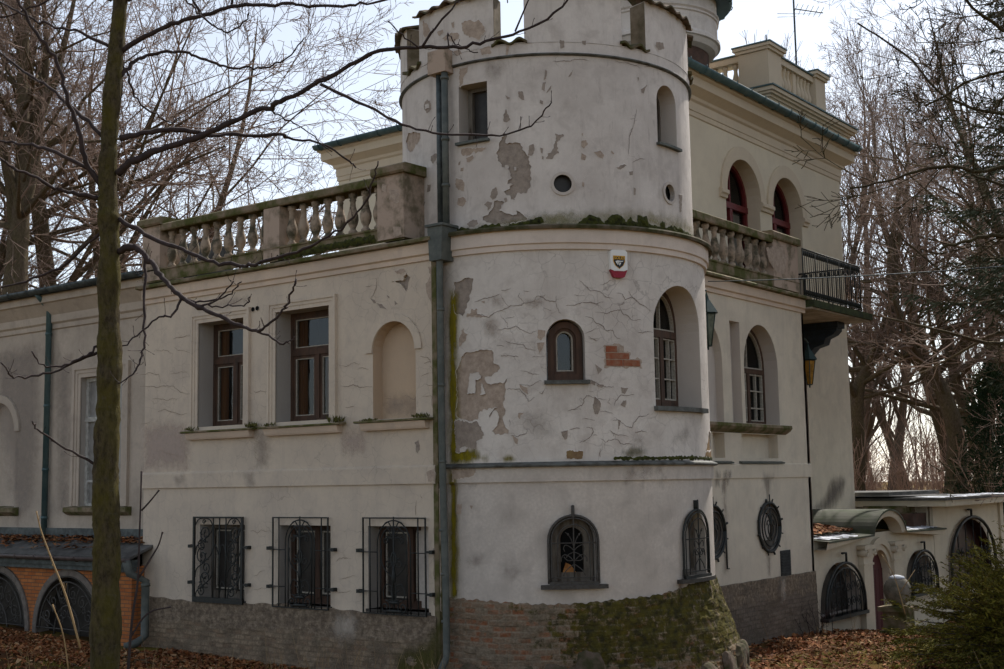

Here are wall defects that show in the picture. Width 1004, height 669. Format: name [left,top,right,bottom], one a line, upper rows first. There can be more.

peeling [422,19,492,56]
peeling [406,131,421,153]
peeling [454,90,565,228]
peeling [392,268,411,292]
peeling [453,277,529,453]
crack [466,280,653,402]
crack [562,379,648,455]
flaking render [590,343,642,415]